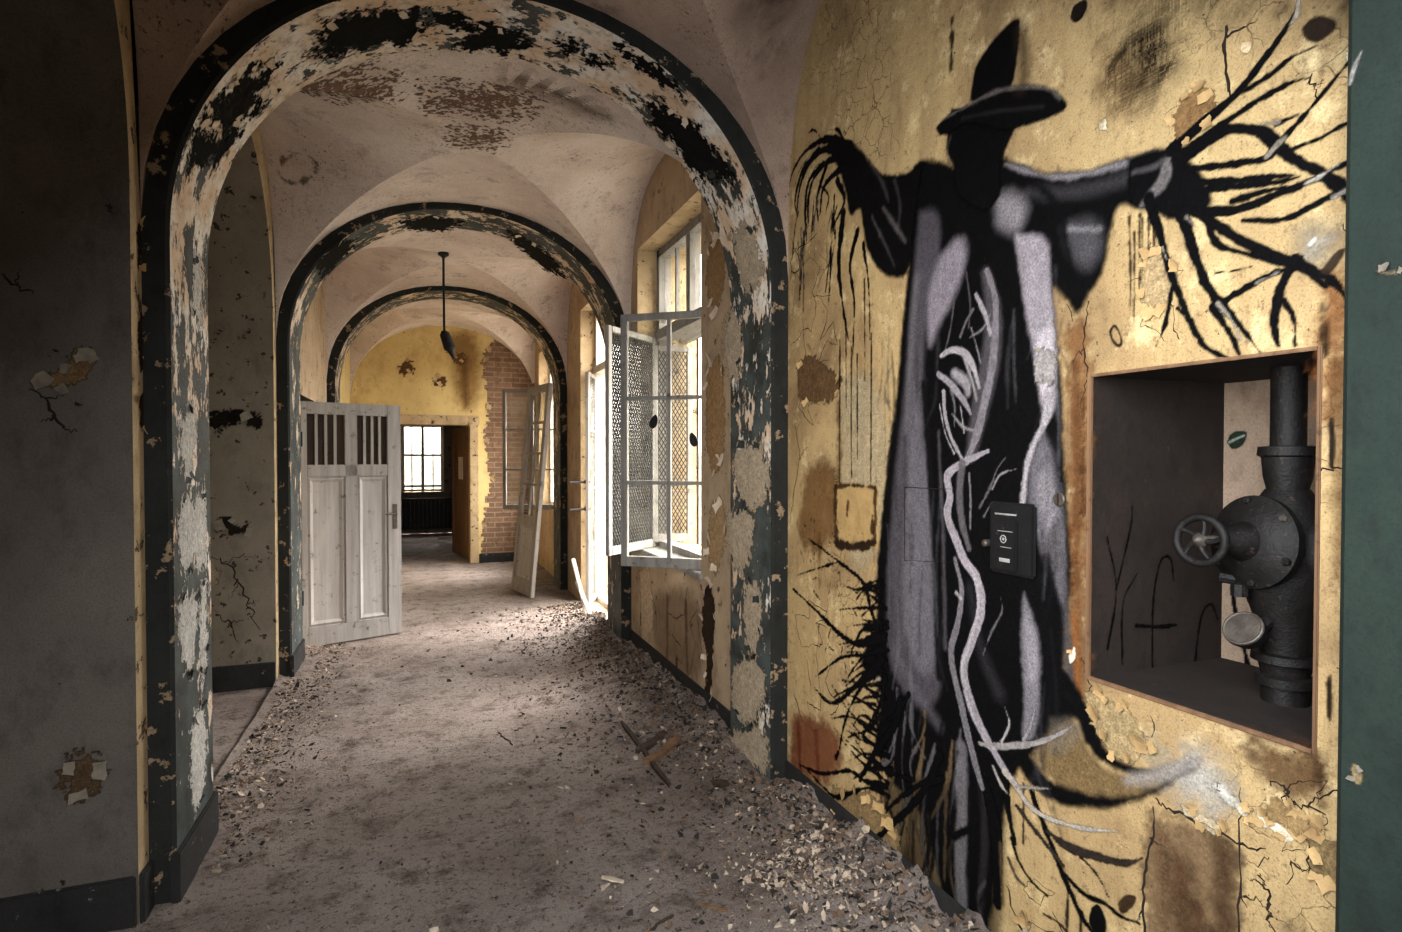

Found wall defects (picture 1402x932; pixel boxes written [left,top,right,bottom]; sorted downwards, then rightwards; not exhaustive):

peeling [185,57,284,179]
peeling [299,5,548,155]
peeling [552,32,738,188]
peeling [189,249,205,330]
peeling [392,215,466,234]
peeling [504,230,568,279]
crack [29,389,77,433]
flaking render [454,340,535,554]
peeling [699,216,771,776]
peeling [176,400,263,822]
peeling [1085,681,1157,765]
crack [1137,780,1337,932]